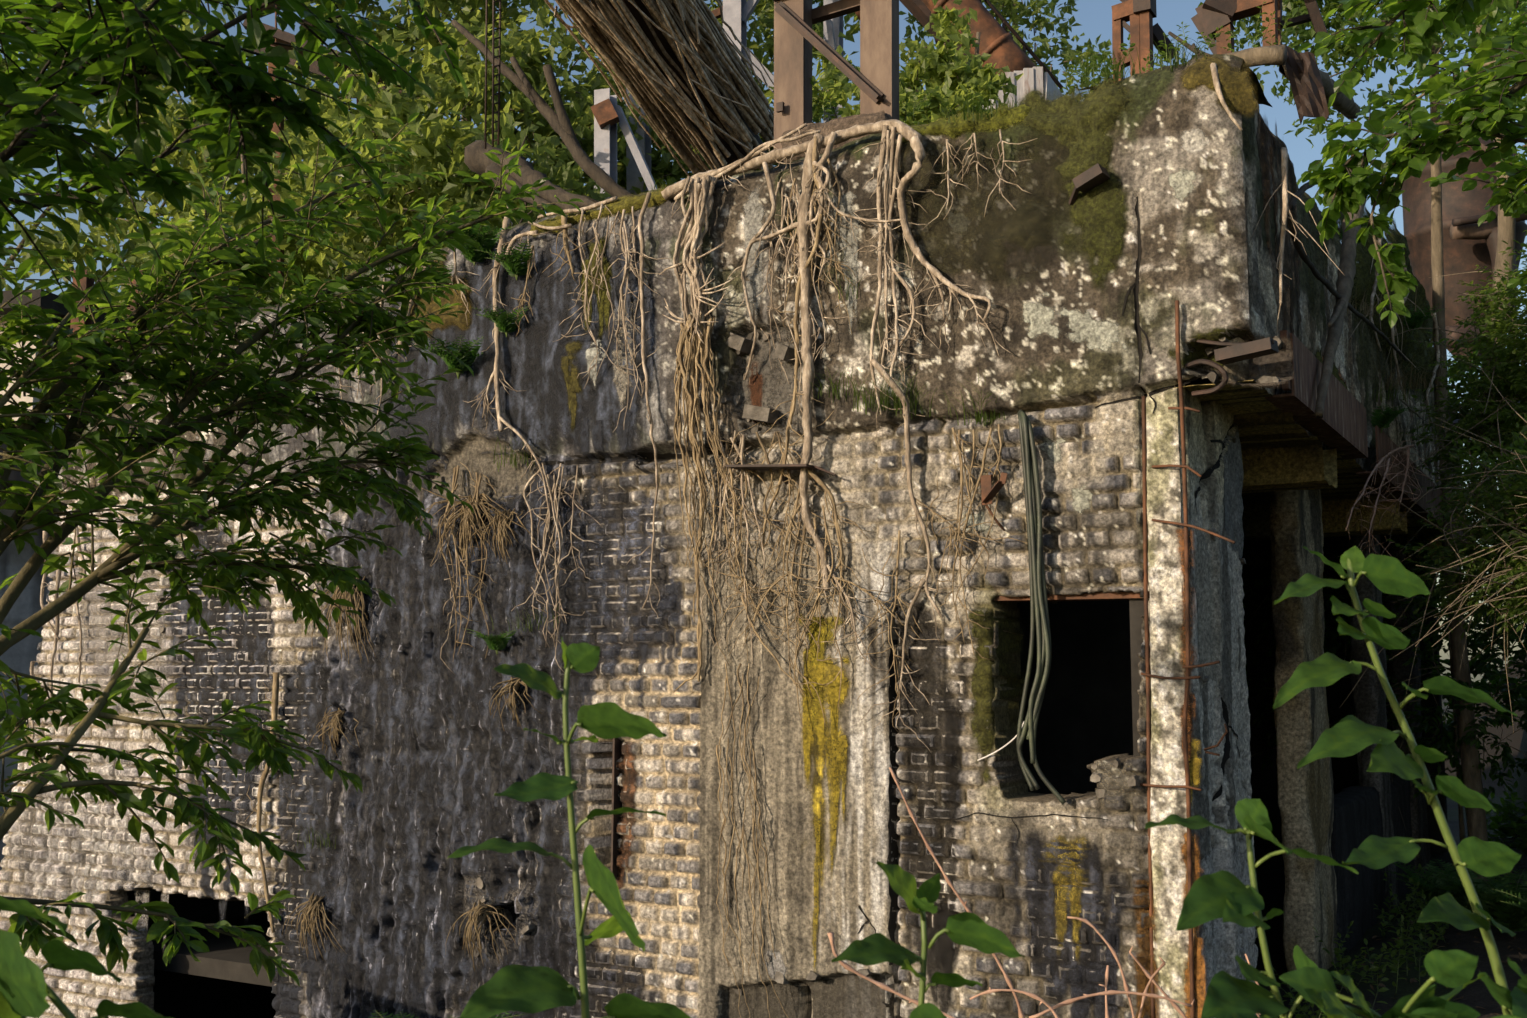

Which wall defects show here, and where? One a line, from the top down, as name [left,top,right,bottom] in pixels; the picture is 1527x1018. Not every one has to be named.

crack [1095,196,1206,414]
rust [1176,529,1196,763]
leakage [802,616,848,969]
rust [1181,832,1200,898]
rust [1184,926,1206,1018]